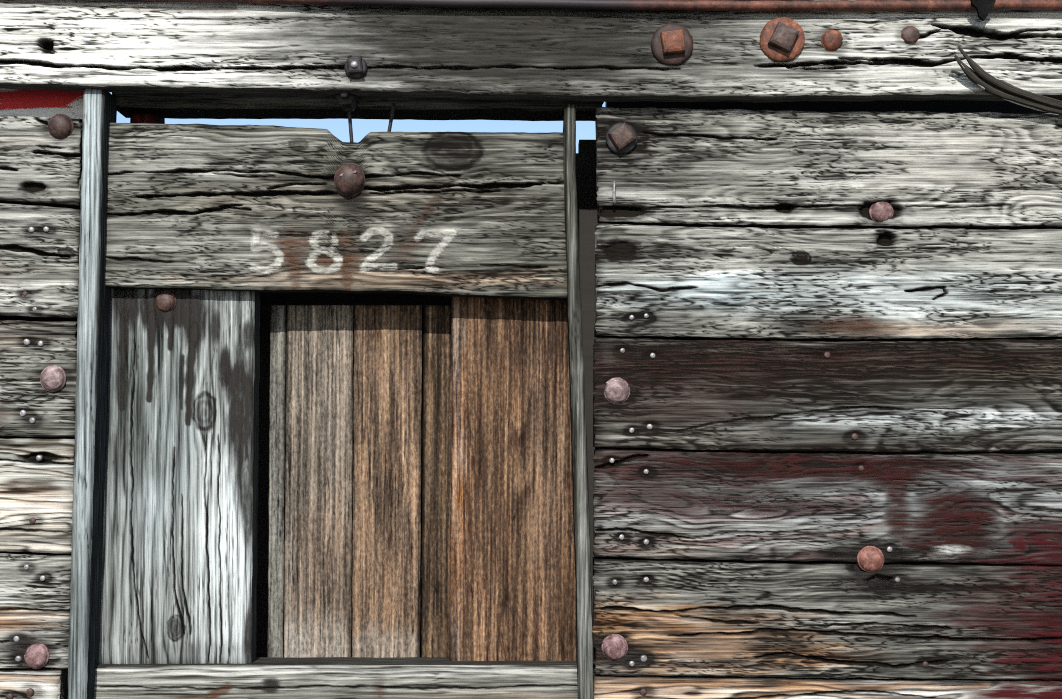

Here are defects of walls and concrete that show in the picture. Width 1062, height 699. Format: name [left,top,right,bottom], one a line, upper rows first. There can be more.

crack [756,25,1062,70]
peeling [0,99,83,120]
crack [0,246,71,258]
leakage [114,288,207,425]